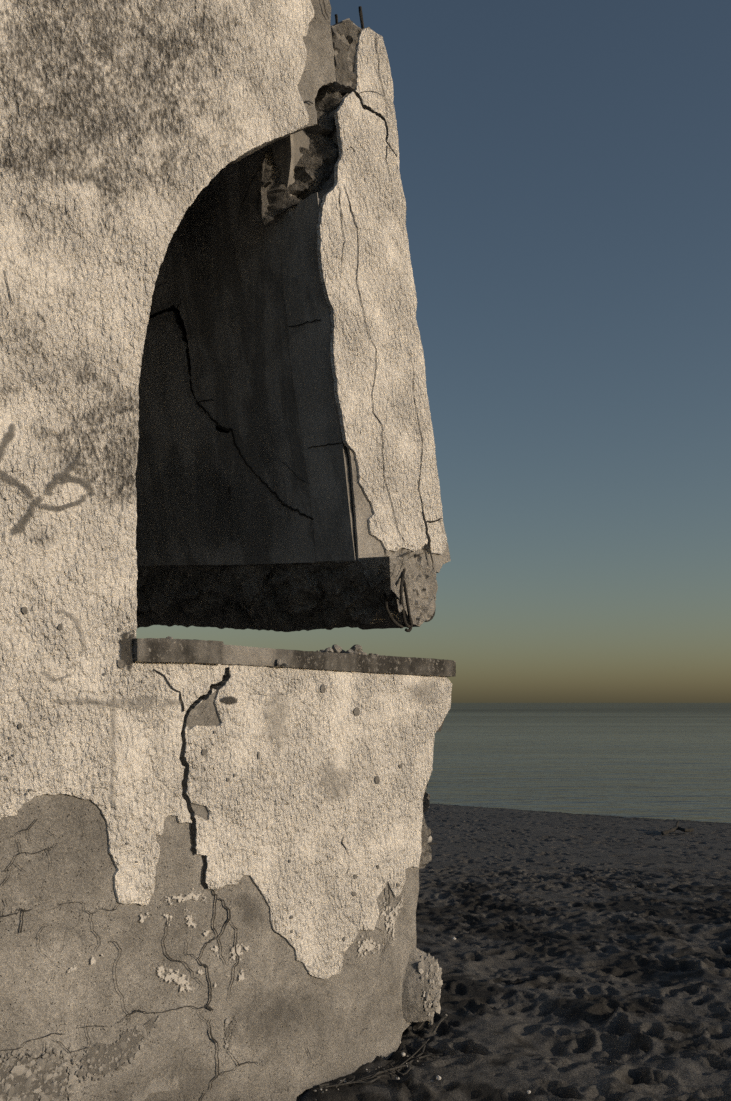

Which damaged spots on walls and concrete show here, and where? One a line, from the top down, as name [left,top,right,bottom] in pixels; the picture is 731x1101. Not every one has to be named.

spalling [254,0,362,225]
crack [329,32,396,176]
crack [149,282,314,520]
crack [338,187,442,577]
spalling [136,448,436,632]
crack [0,667,261,1101]
peeling [0,784,437,1101]